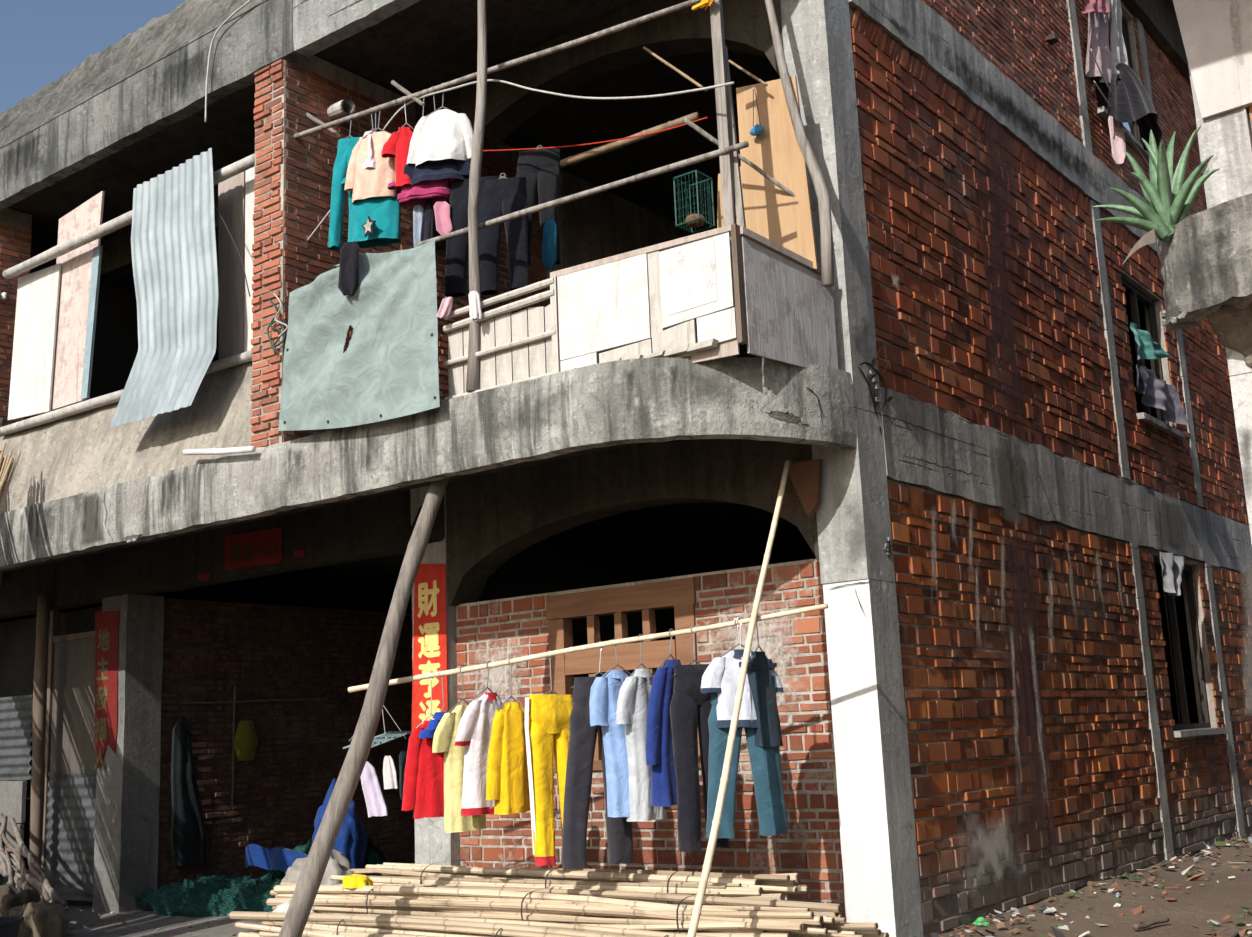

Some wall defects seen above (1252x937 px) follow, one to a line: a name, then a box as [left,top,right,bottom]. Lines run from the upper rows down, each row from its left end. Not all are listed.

leakage [937,38,1091,423]
leakage [997,439,1024,524]
leakage [1001,540,1056,860]